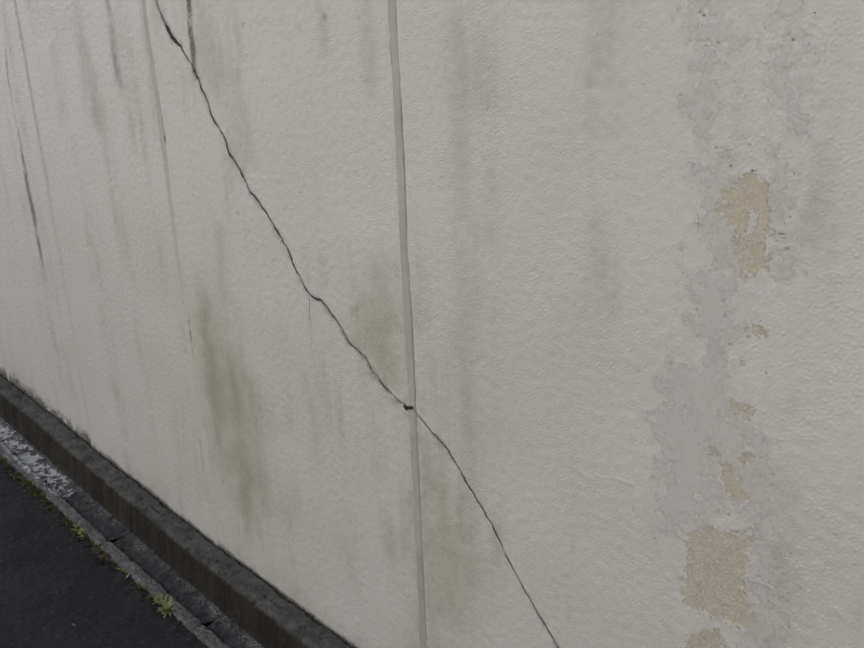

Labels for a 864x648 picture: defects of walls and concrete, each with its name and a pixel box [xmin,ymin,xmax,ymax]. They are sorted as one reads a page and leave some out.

peeling [714,170,788,278]
crack [156,0,558,648]
damp [1,371,174,513]
damp [183,519,355,648]
peeling [680,525,756,648]